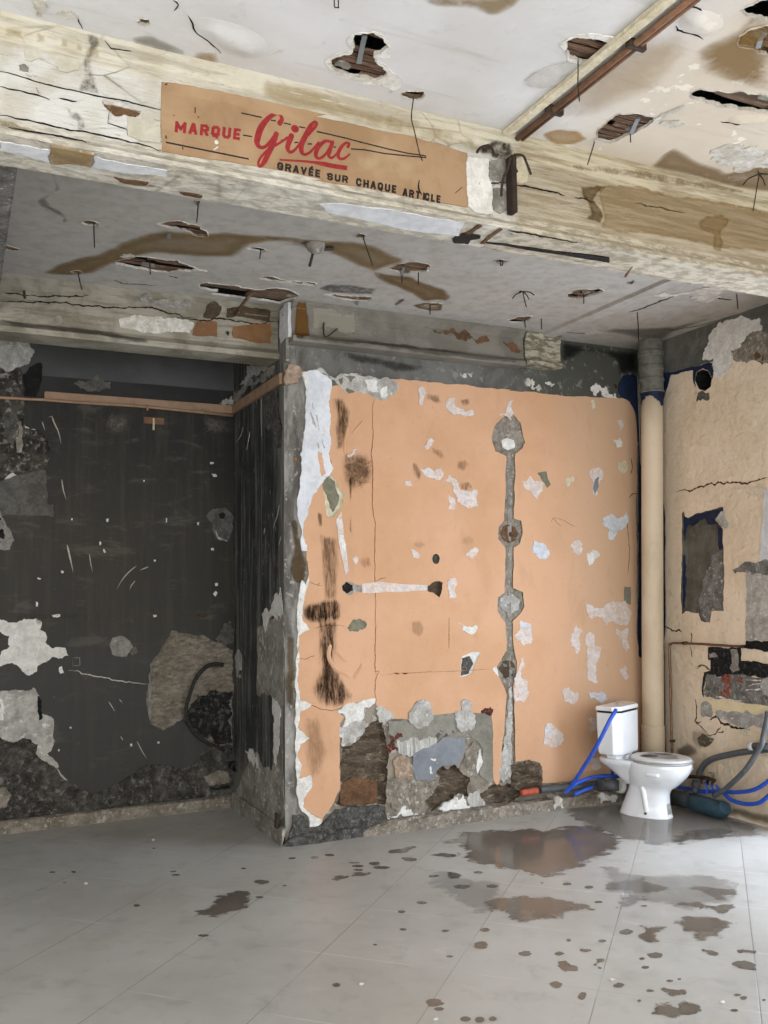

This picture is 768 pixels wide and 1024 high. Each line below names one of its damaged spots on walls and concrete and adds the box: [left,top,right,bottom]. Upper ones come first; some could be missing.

crack [173,0,221,54]
water stain [707,29,762,80]
crack [0,71,161,151]
water stain [48,232,309,274]
water stain [325,242,448,310]
peeling [663,315,768,402]
crack [678,478,765,492]
water stain [305,590,345,705]
flaking render [0,578,322,827]
flaking render [335,619,564,819]
peeling [701,700,768,729]